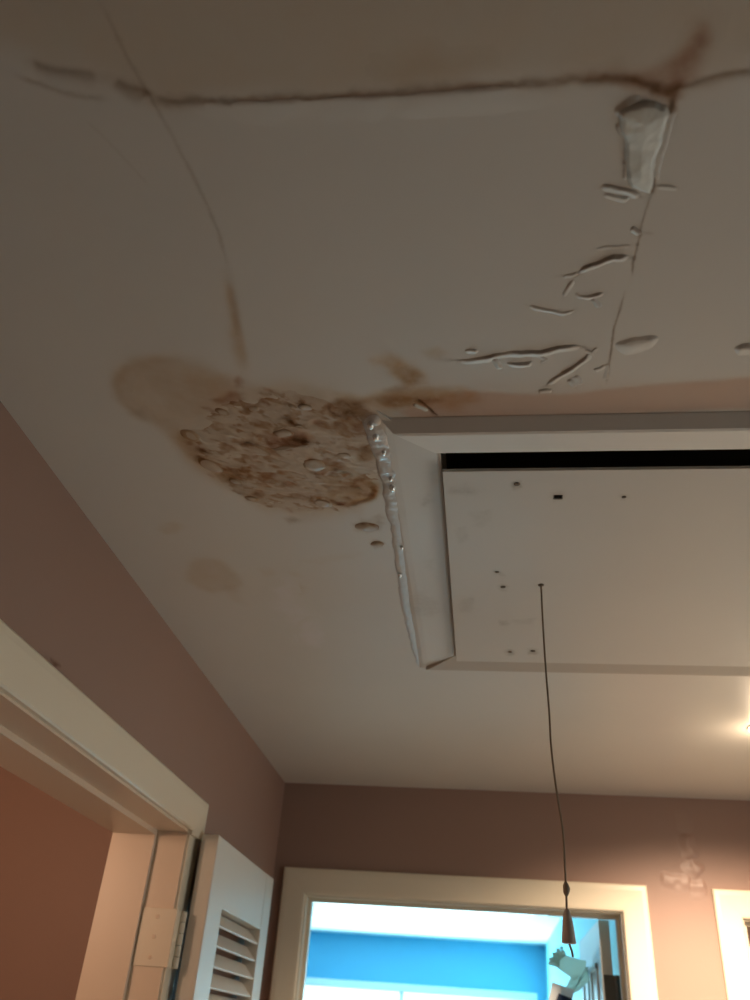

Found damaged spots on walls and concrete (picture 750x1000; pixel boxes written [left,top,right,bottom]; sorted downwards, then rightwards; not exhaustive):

crack [190,84,561,127]
peeling [613,94,670,194]
crack [654,109,677,183]
damp [180,390,419,666]